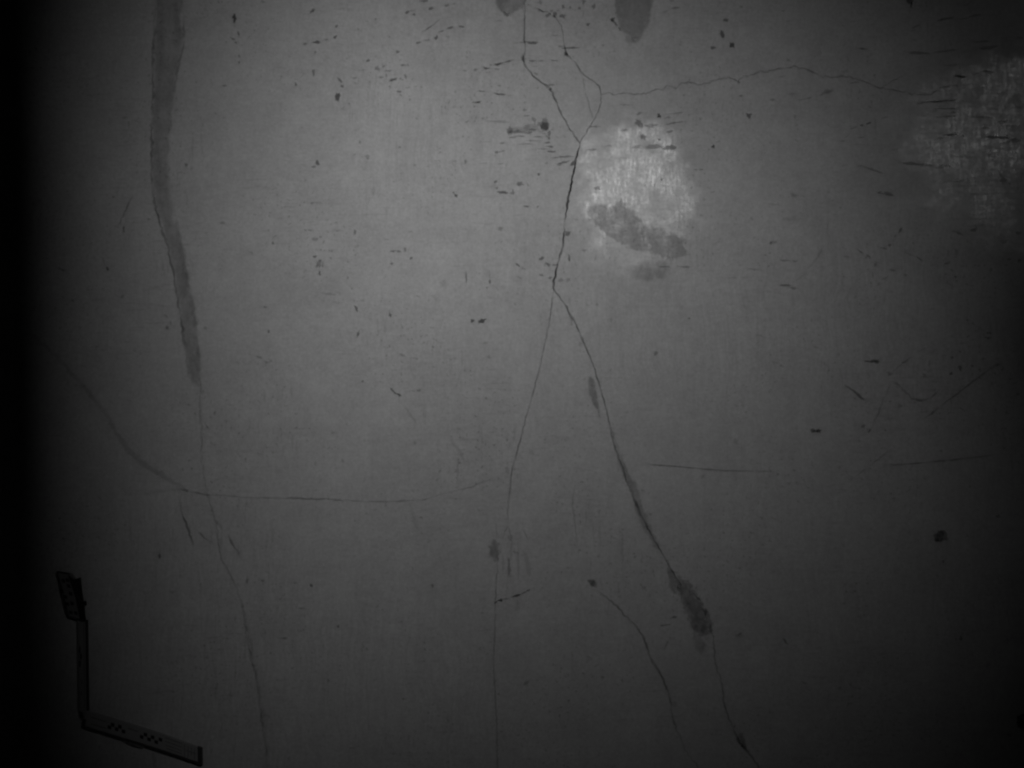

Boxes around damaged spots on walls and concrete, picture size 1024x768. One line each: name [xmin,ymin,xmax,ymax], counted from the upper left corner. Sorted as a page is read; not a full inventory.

crack [562,149,579,242]